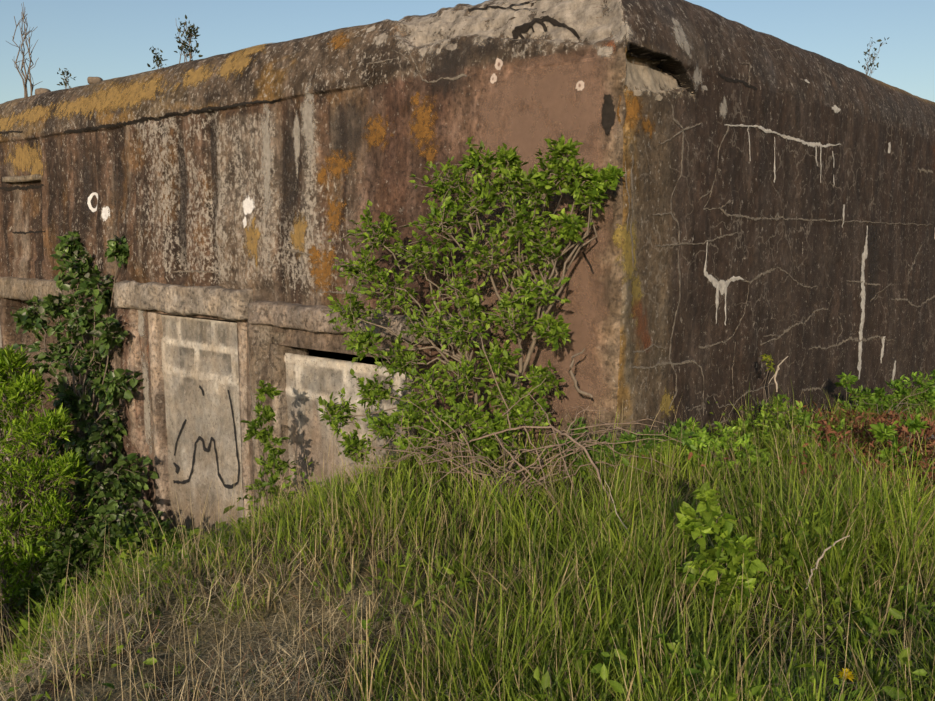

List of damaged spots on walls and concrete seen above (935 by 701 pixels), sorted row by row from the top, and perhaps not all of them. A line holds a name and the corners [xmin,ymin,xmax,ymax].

crack [468,0,580,39]
spalling [672,18,690,55]
spalling [625,58,707,101]
water stain [177,159,187,241]
water stain [261,107,273,213]
water stain [283,84,316,209]
crack [625,41,935,426]